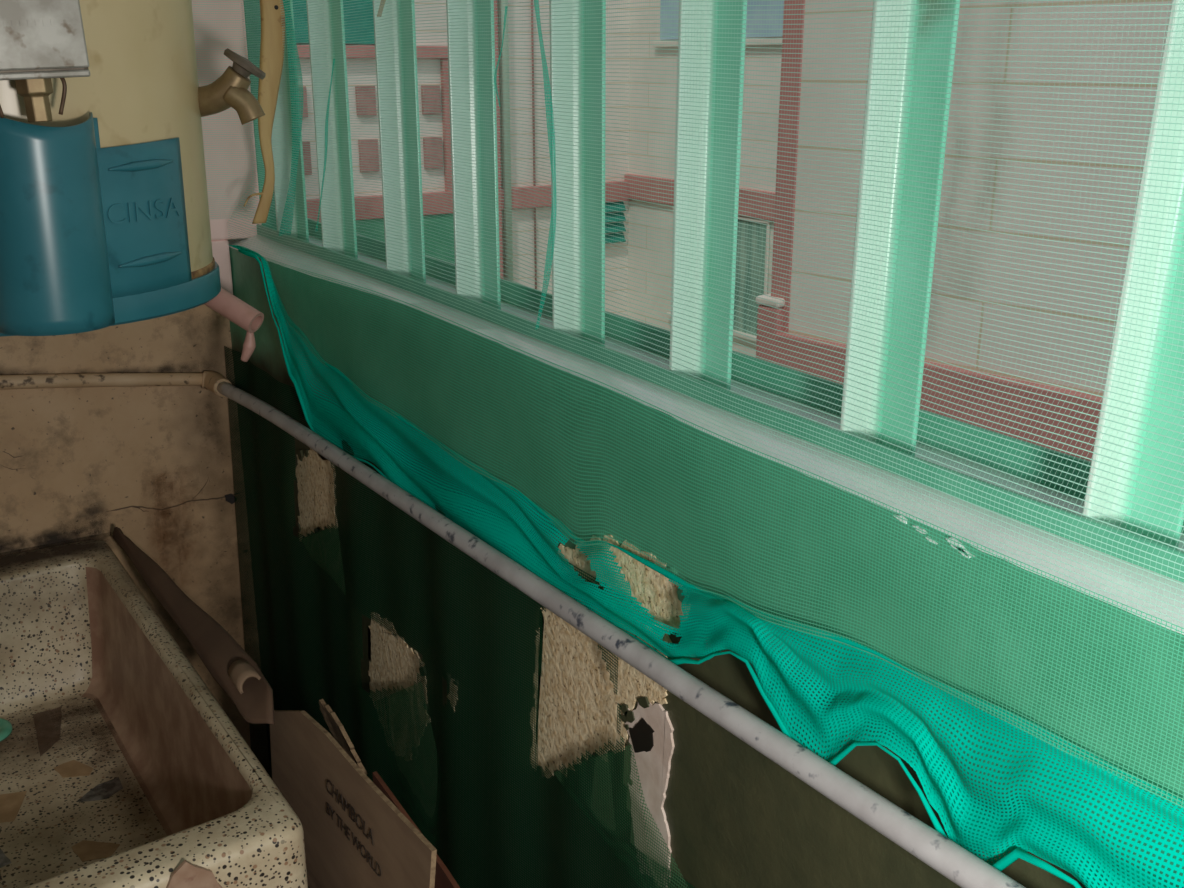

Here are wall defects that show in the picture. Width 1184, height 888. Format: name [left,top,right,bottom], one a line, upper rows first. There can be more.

flaking render [295,448,338,541]
flaking render [548,534,690,658]
flaking render [368,612,431,761]
flaking render [530,608,675,888]